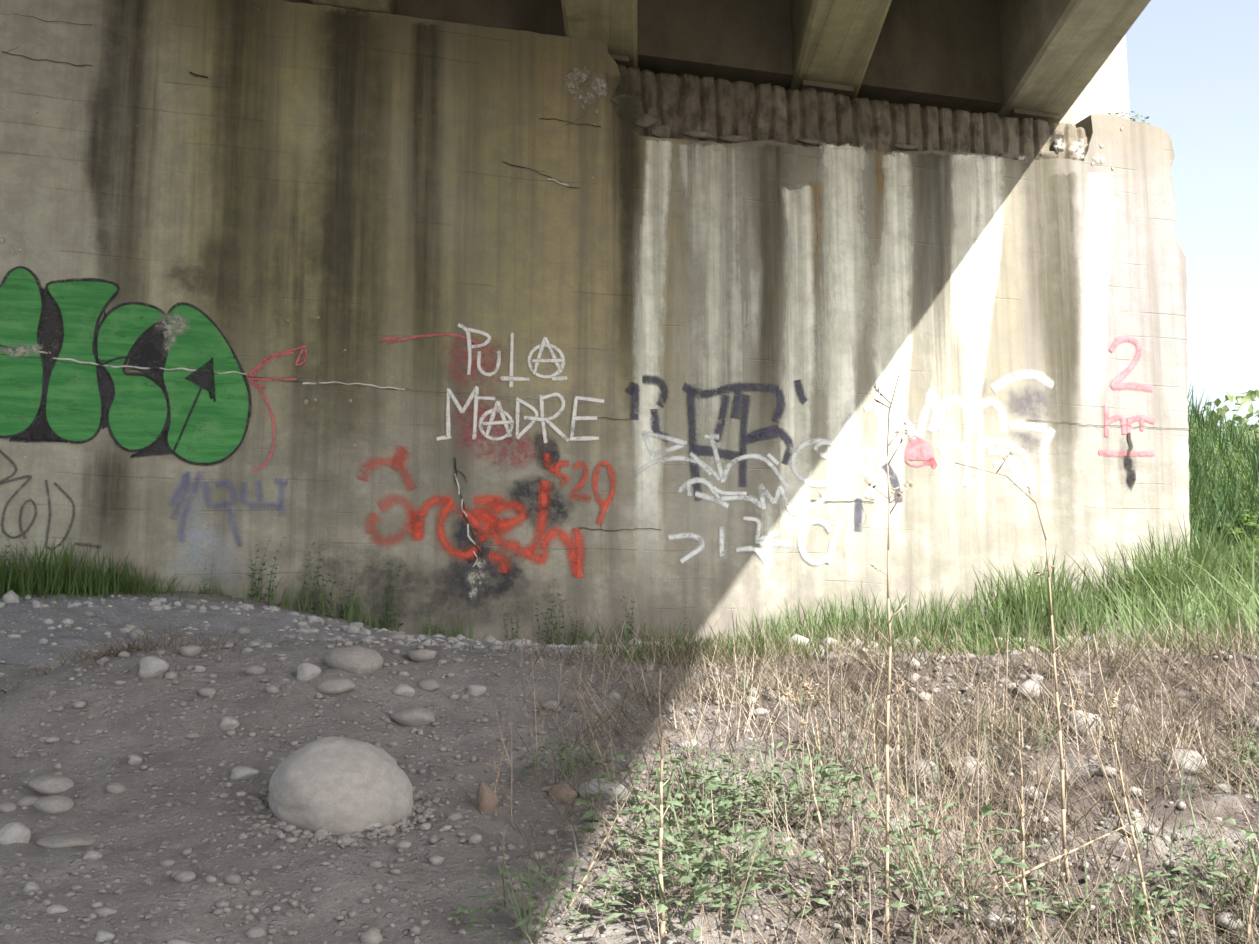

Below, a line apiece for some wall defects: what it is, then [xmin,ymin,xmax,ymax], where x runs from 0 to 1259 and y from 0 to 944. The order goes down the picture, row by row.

leakage [92,0,143,190]
leakage [174,0,247,309]
crack [1,349,632,420]
leakage [320,11,374,364]
leakage [414,24,436,304]
crack [454,458,484,588]
leakage [618,74,864,566]
spalling [565,64,1114,170]
leakage [874,153,1003,490]
leakage [1036,152,1111,425]